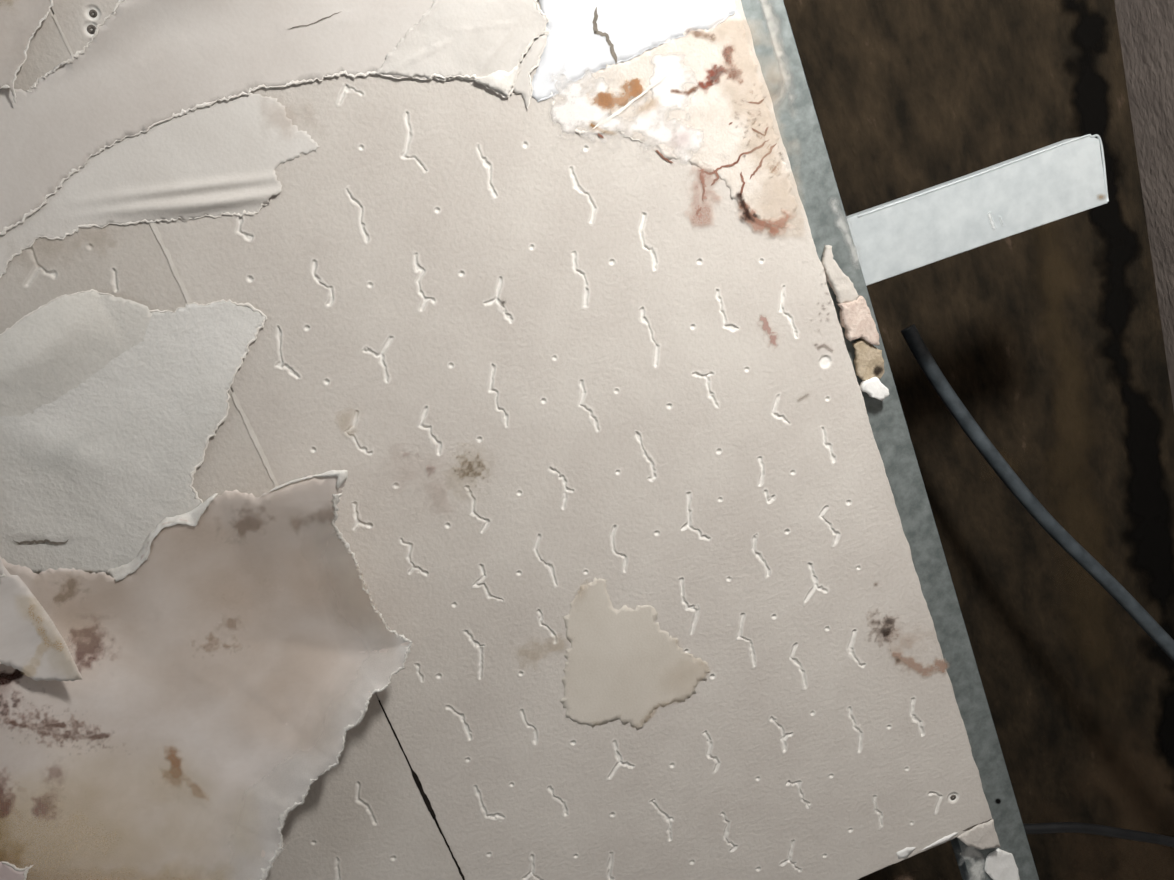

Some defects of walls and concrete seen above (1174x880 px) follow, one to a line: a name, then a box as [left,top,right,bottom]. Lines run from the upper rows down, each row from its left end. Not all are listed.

crack [593,7,617,64]
peeling [474,28,550,110]
corrosion [594,78,643,109]
peeling [551,11,798,228]
corrosion [671,46,743,95]
crack [656,99,777,228]
corrosion [740,203,789,235]
leakage [455,455,485,478]
leakage [71,626,101,667]
leakage [0,669,109,740]
leakage [0,784,11,818]
crack [378,700,465,880]